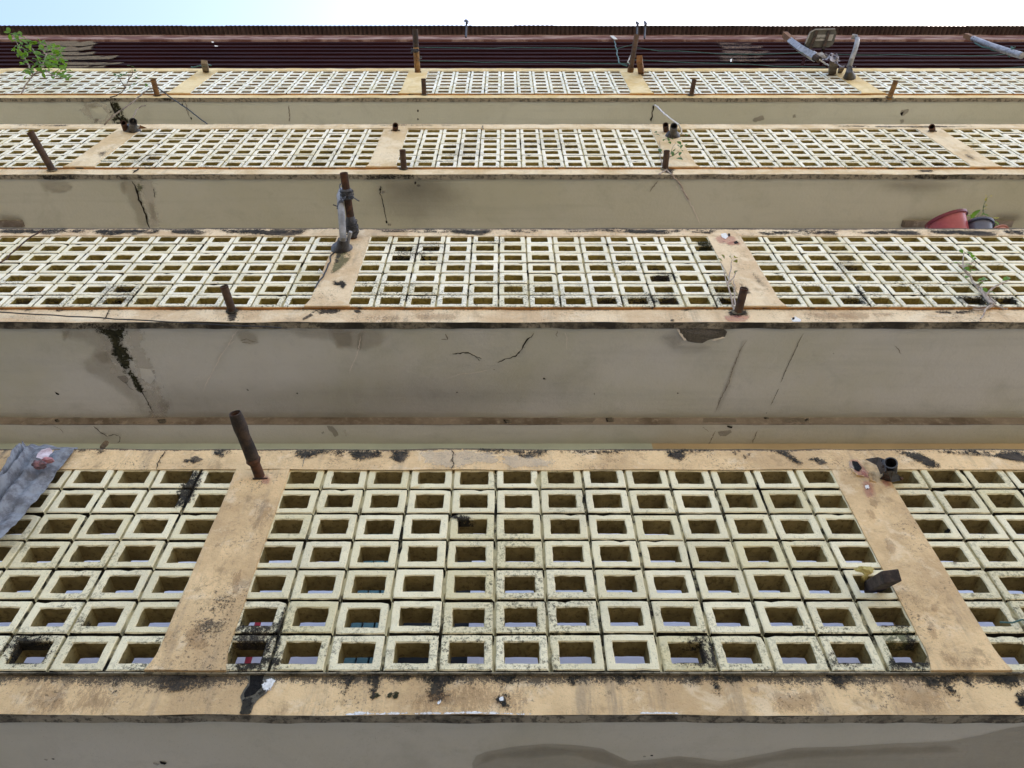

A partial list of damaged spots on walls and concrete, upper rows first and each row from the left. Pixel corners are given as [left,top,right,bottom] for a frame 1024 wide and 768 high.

crack [132,168,155,228]
crack [96,310,151,409]
crack [442,331,558,363]
spalling [677,328,727,343]
crack [703,342,746,440]
leakage [175,449,235,512]
leakage [152,675,214,693]
leakage [338,662,462,702]
leakage [491,675,520,687]
leakage [567,675,645,686]
leakage [989,675,1022,688]